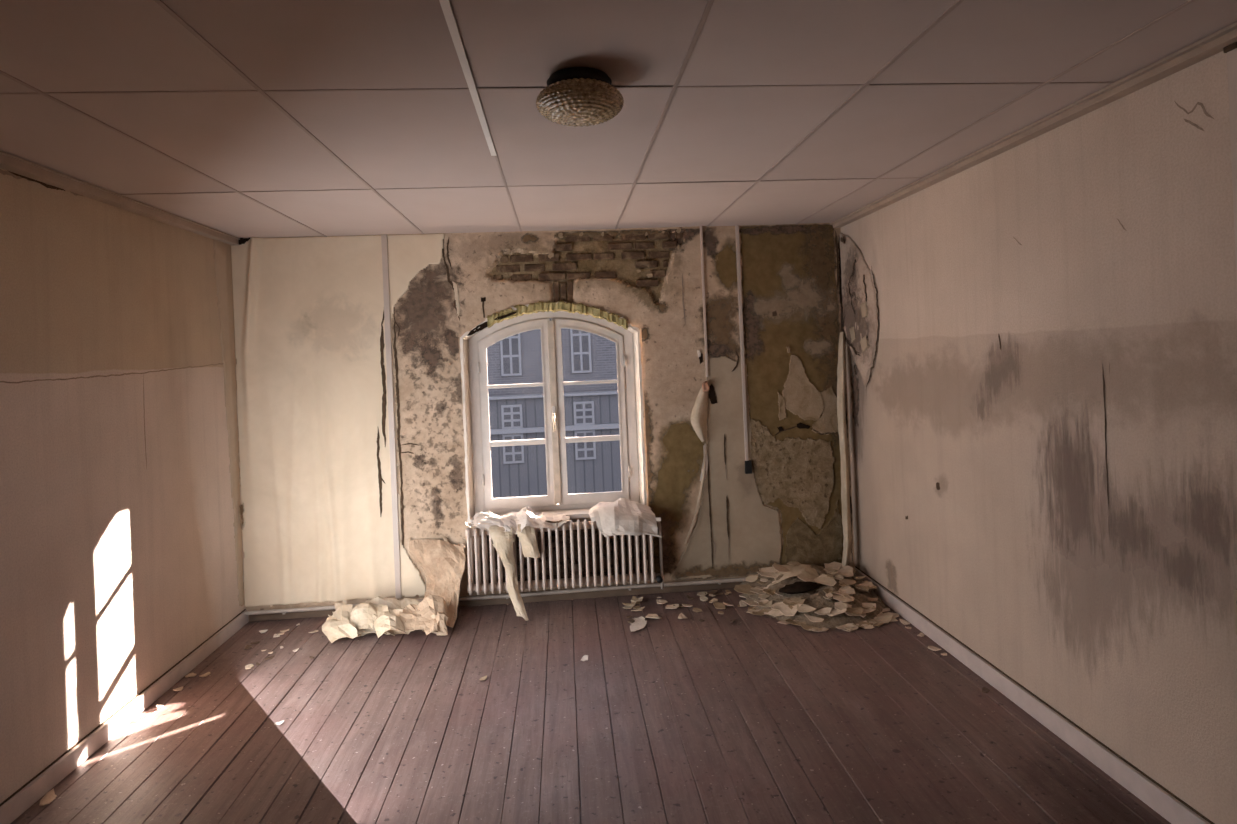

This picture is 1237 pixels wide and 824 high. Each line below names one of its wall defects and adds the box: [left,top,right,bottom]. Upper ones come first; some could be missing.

flaking render [467,228,685,336]